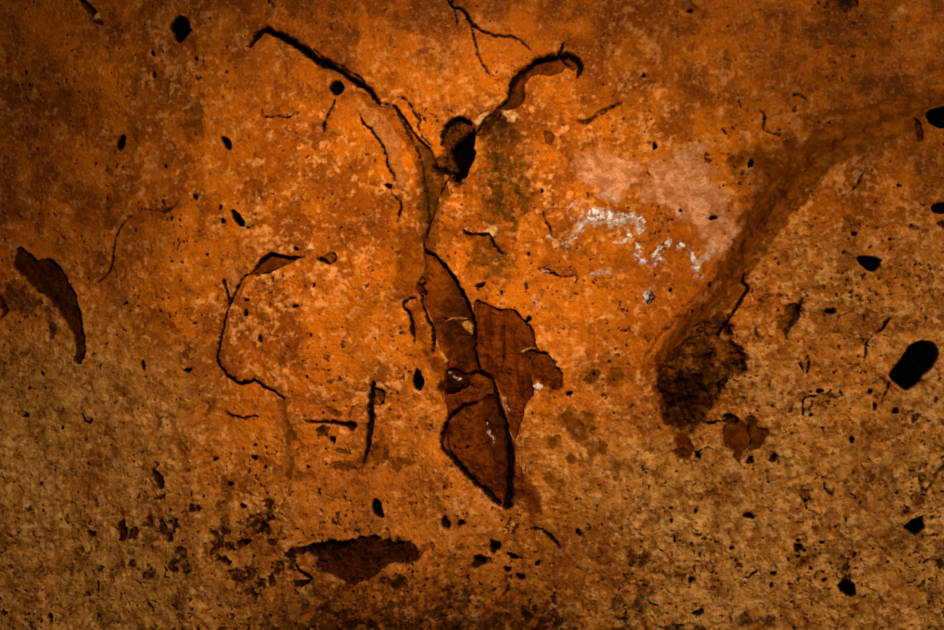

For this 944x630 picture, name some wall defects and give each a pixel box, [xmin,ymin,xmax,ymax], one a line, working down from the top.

crack [448,0,583,108]
crack [249,0,483,373]
crack [463,226,504,254]
leakage [547,192,715,271]
flaking render [0,247,86,364]
crack [216,272,285,399]
flaking render [358,93,572,509]
crack [305,383,414,475]
flaking render [210,498,434,600]